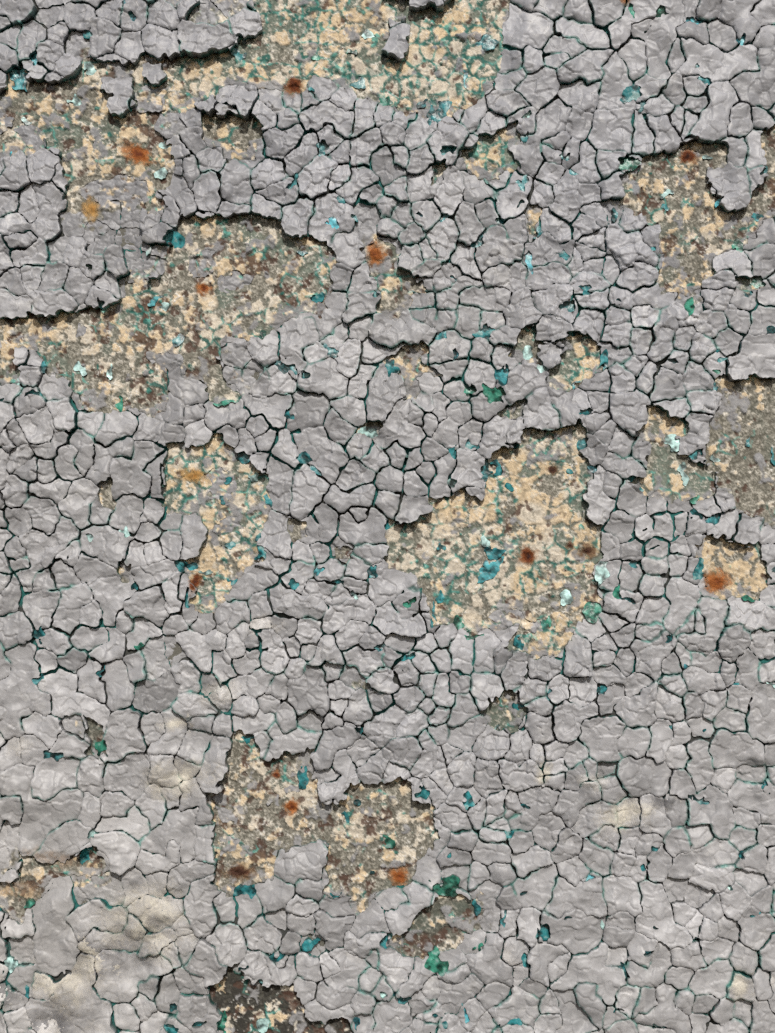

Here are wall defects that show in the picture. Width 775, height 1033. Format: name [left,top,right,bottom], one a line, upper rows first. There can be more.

corrosion [122,144,152,165]
peeling [0,0,510,222]
crack [251,102,410,208]
peeling [0,213,339,418]
corrosion [368,242,387,264]
crack [244,327,483,562]
peeling [367,324,635,660]
corrosion [704,570,732,593]
crack [178,485,768,883]
peeling [206,729,440,915]
crack [49,884,344,1033]
peeling [193,963,360,1033]